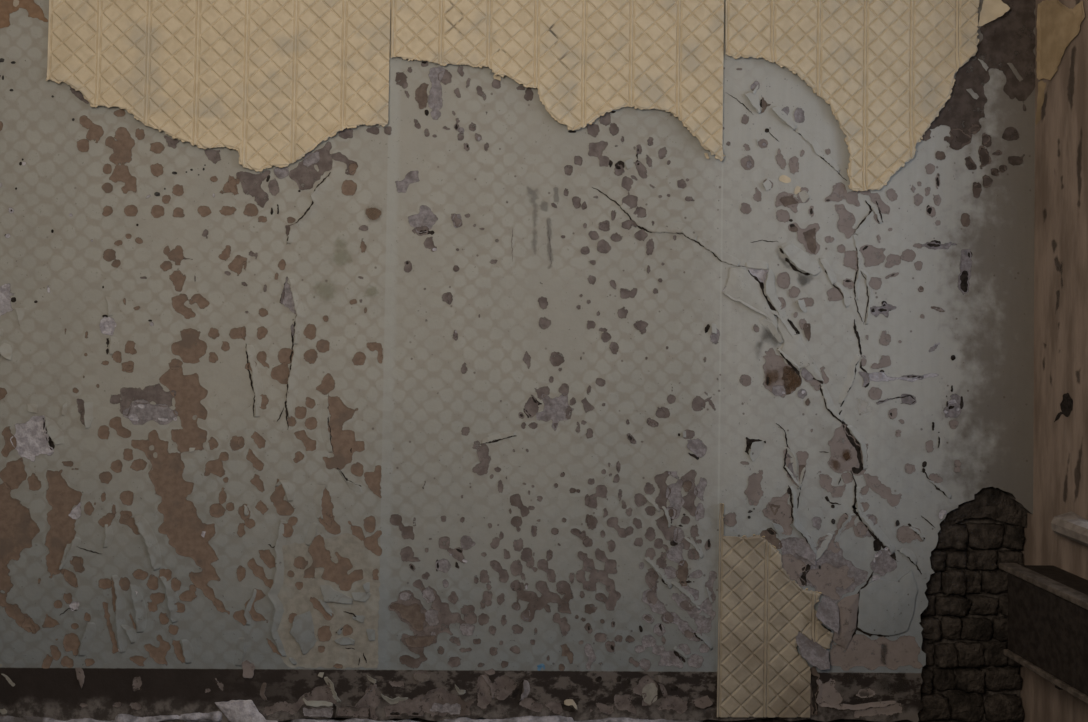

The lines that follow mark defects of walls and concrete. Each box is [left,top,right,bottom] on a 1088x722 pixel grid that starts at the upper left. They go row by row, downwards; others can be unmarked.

peeling [0,0,48,28]
peeling [103,234,143,268]
peeling [70,87,358,239]
peeling [359,208,381,253]
spalling [408,205,438,252]
peeling [395,59,501,151]
peeling [564,111,693,294]
crack [592,187,778,267]
spalling [722,128,972,406]
peeling [911,0,1036,226]
crack [804,200,922,594]
peeling [0,245,1027,722]